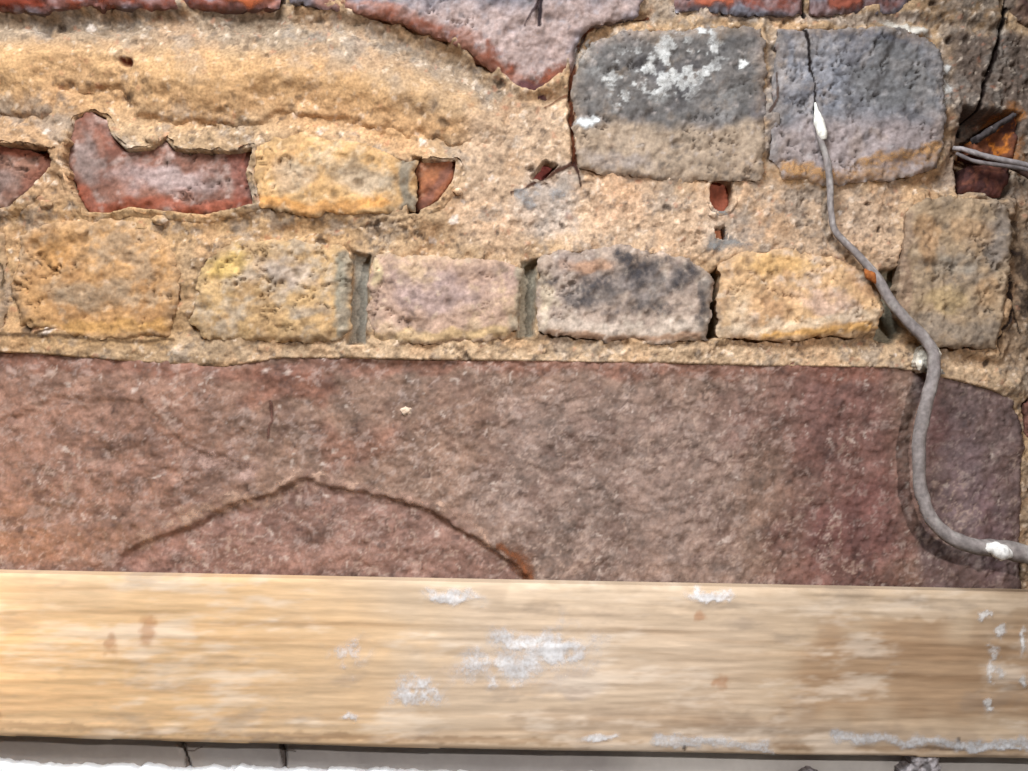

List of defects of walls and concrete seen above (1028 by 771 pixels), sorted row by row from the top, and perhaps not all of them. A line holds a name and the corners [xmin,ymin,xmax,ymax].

crack [524,0,543,26]
damp [632,38,710,94]
crack [956,3,1008,138]
crack [510,25,604,193]
corrosion [981,104,1026,130]
crack [266,400,274,438]
corrosion [496,543,533,580]